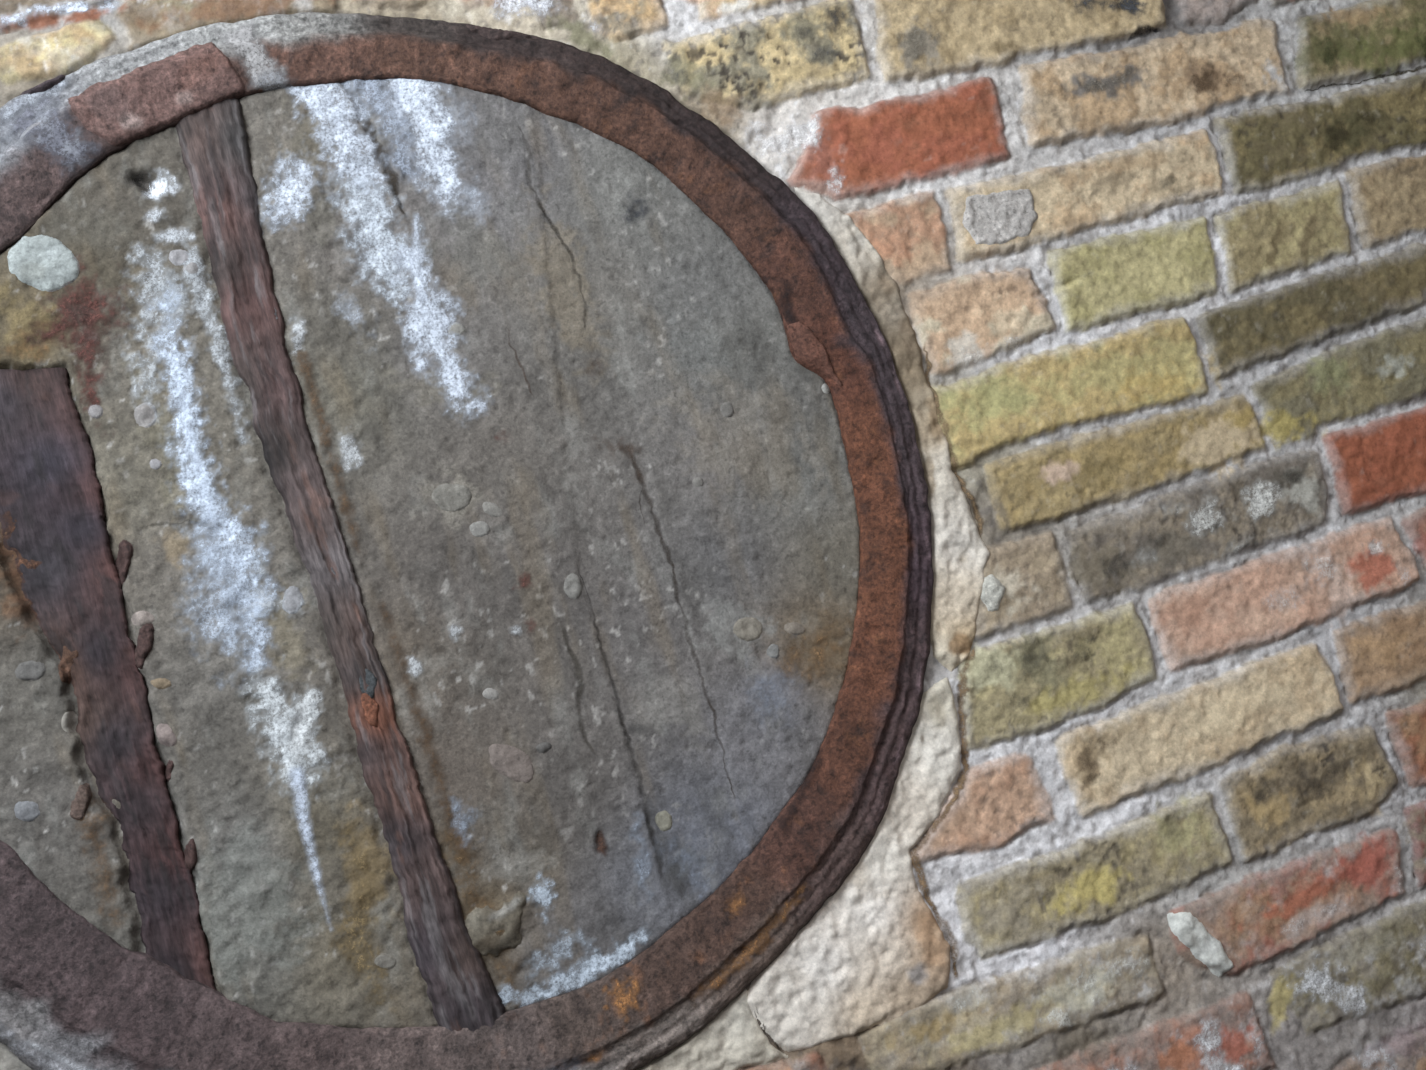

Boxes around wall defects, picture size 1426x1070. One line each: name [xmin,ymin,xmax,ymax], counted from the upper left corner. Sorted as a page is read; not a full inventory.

water stain [263,78,486,414]
crack [528,164,580,276]
corrosion [19,264,127,409]
corrosion [115,540,133,586]
water stain [128,246,326,893]
crack [633,462,678,601]
corrosion [135,623,154,669]
water stain [409,657,421,675]
corrosion [184,838,198,871]
water stain [529,874,557,919]
water stain [500,931,647,1007]
corrosion [699,886,804,988]